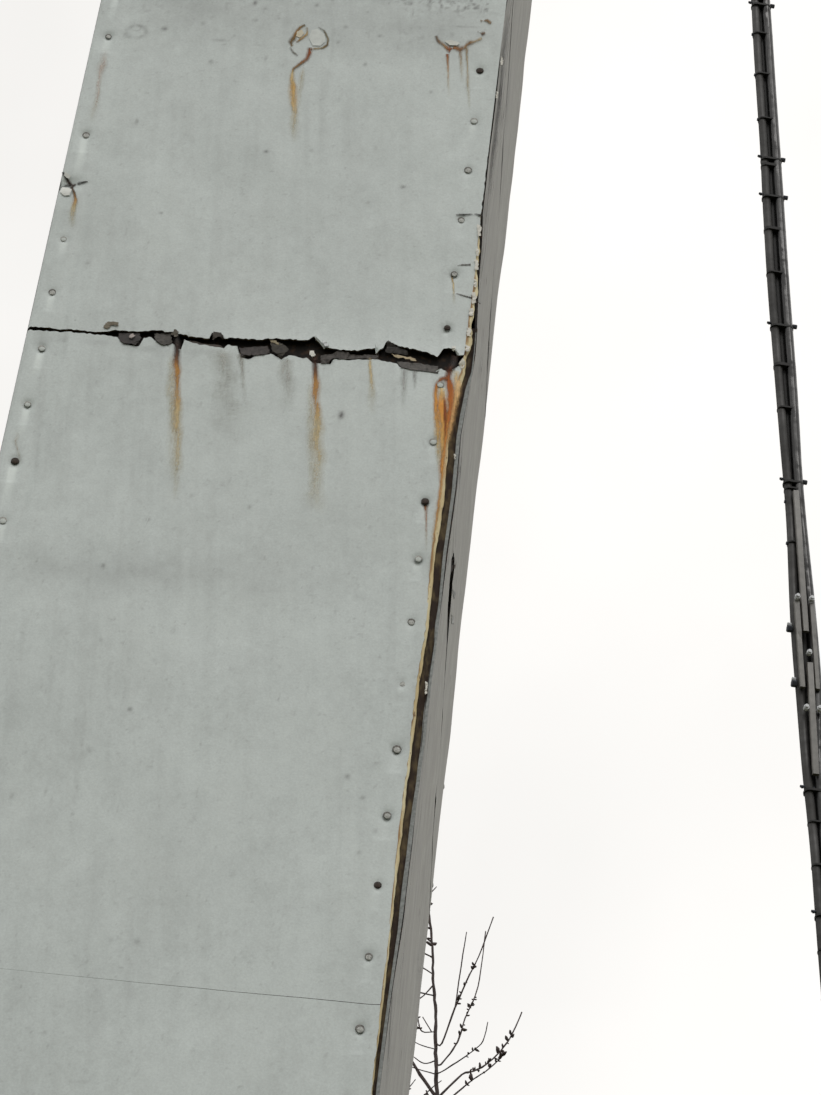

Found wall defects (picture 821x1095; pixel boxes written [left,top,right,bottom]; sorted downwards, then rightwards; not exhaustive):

rust [289,24,329,125]
rust [435,19,491,86]
crack [32,321,466,373]
rust [171,336,180,469]
rust [310,350,321,469]
crack [449,559,457,624]
rust [371,238,480,1095]